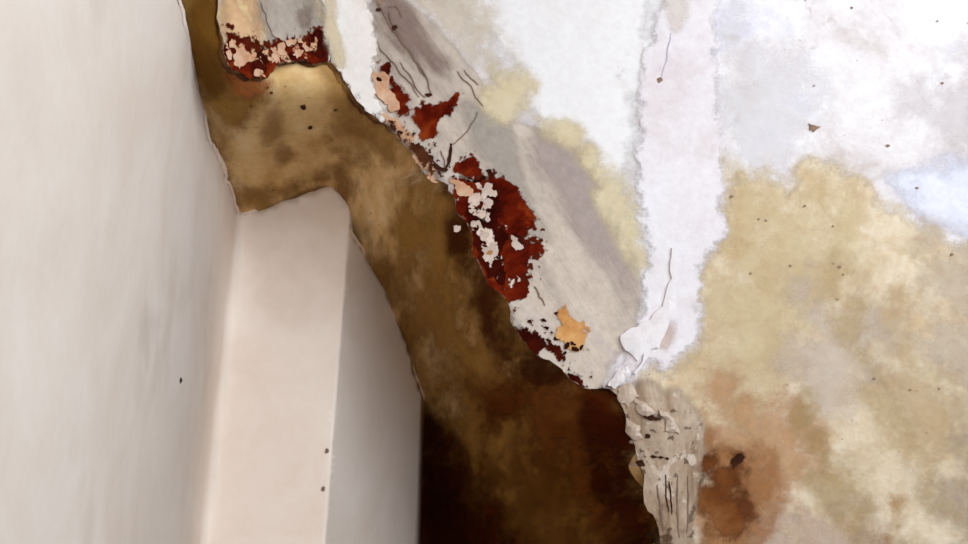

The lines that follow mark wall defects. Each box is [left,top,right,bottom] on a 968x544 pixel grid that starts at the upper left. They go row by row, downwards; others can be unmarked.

spalling [178,0,191,46]
spalling [192,60,258,214]
damp [181,0,272,129]
rust [221,23,331,100]
flaking render [259,0,325,46]
damp [315,0,396,200]
rust [371,60,460,142]
rust [449,153,593,388]
flaking render [369,0,730,544]
damp [373,176,657,544]
damp [638,155,968,544]